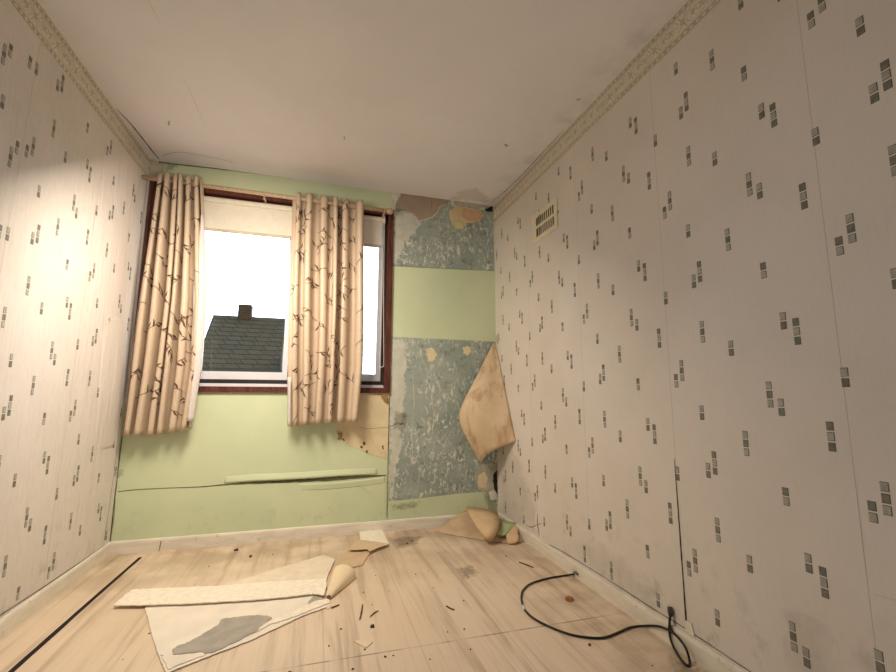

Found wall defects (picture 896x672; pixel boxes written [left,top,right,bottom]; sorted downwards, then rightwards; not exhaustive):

crack [122,115,291,179]
peeling [392,192,493,230]
spalling [425,347,437,362]
spalling [474,463,498,500]
crack [0,394,404,615]